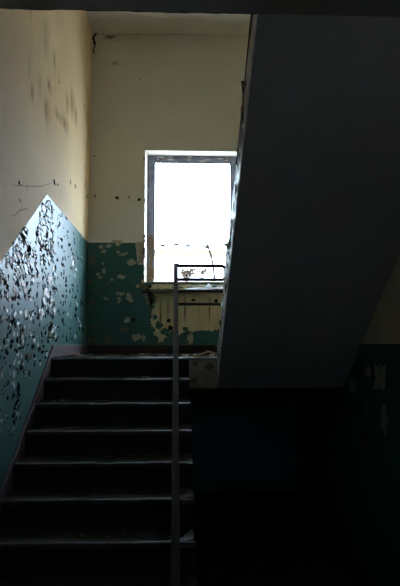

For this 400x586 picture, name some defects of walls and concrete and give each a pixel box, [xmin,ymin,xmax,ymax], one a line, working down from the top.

crack [92,33,185,54]
peeling [0,200,106,435]
peeling [112,218,234,368]